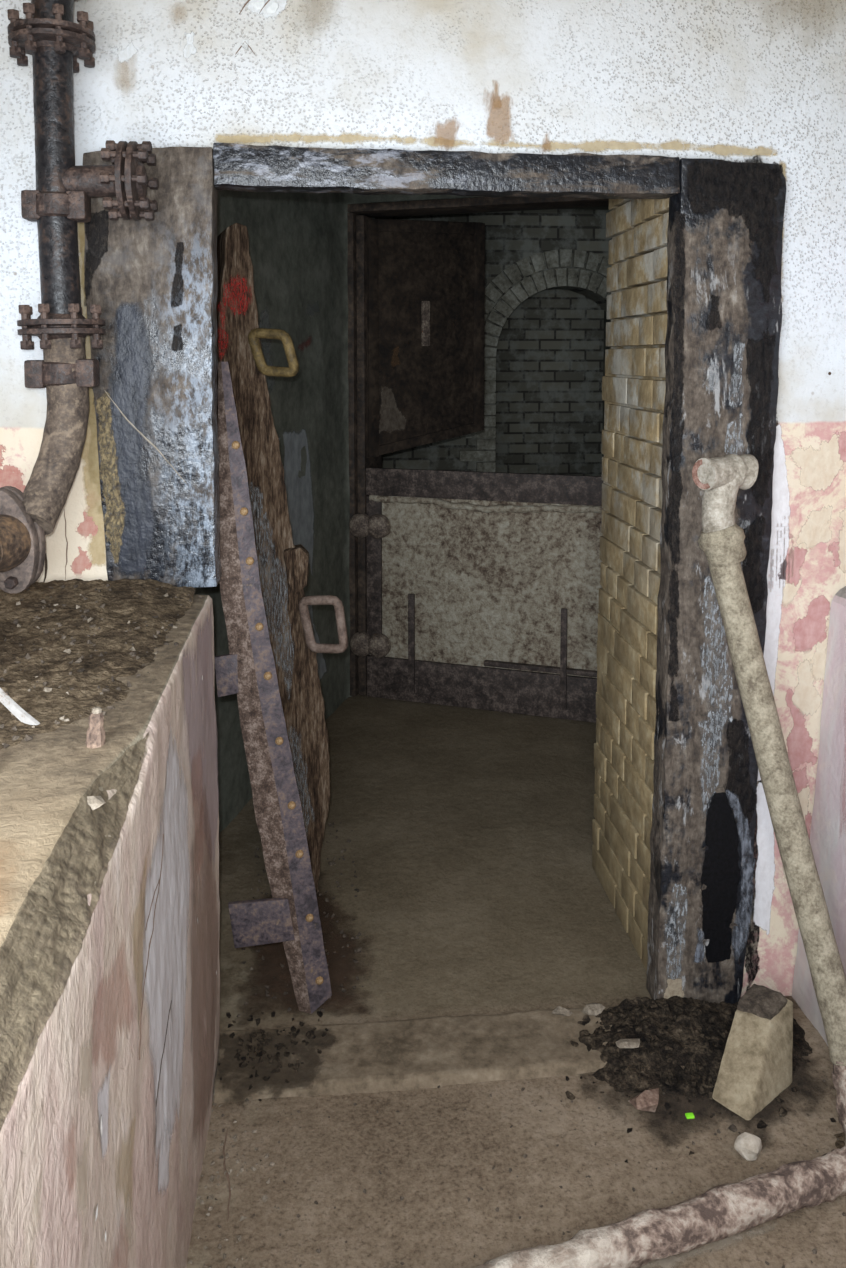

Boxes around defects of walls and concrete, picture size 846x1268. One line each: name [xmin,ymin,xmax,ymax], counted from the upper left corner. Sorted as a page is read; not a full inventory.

peeling [239,0,287,20]
water stain [216,134,465,146]
rust [437,121,458,148]
rust [487,84,510,143]
water stain [489,141,786,177]
peeling [0,445,26,492]
peeling [70,512,98,574]
peeling [763,424,846,839]
peeling [754,769,786,935]